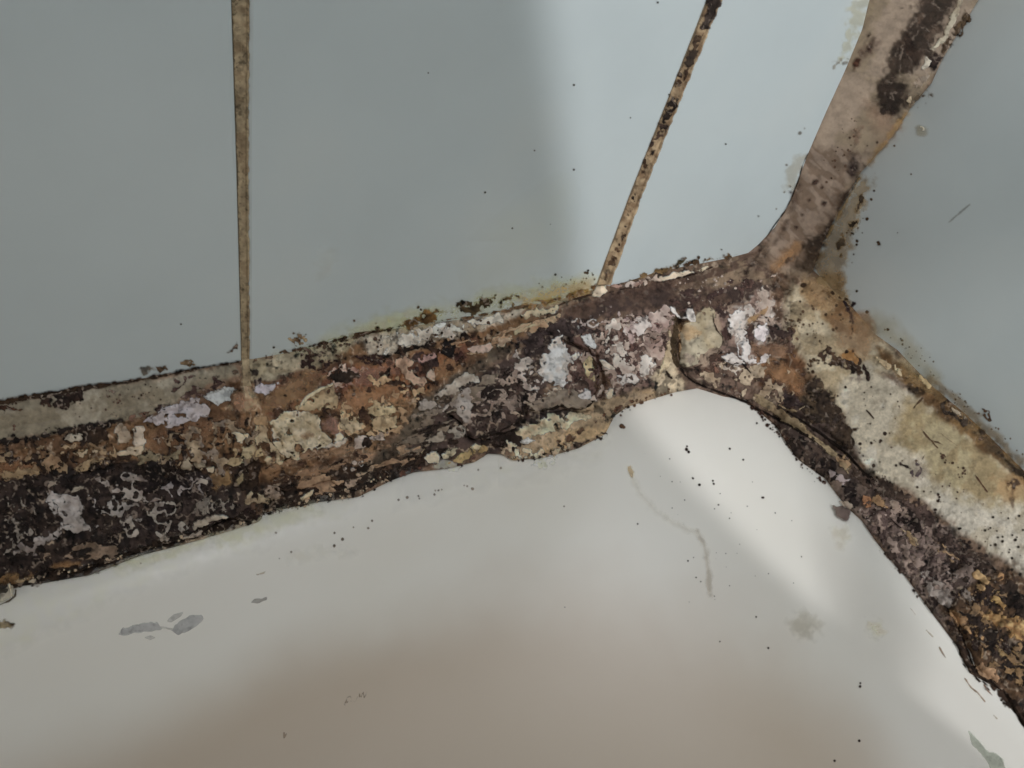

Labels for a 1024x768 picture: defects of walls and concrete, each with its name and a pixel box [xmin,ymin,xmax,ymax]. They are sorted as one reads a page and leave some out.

damp [642,0,722,173]
damp [853,35,874,69]
damp [877,0,971,115]
damp [812,118,858,189]
corrosion [826,178,864,257]
corrosion [265,370,326,410]
flaking render [0,275,851,561]
damp [0,191,1024,720]
corrosion [751,343,804,392]
corrosion [908,374,1024,478]
flaking render [833,495,1024,686]